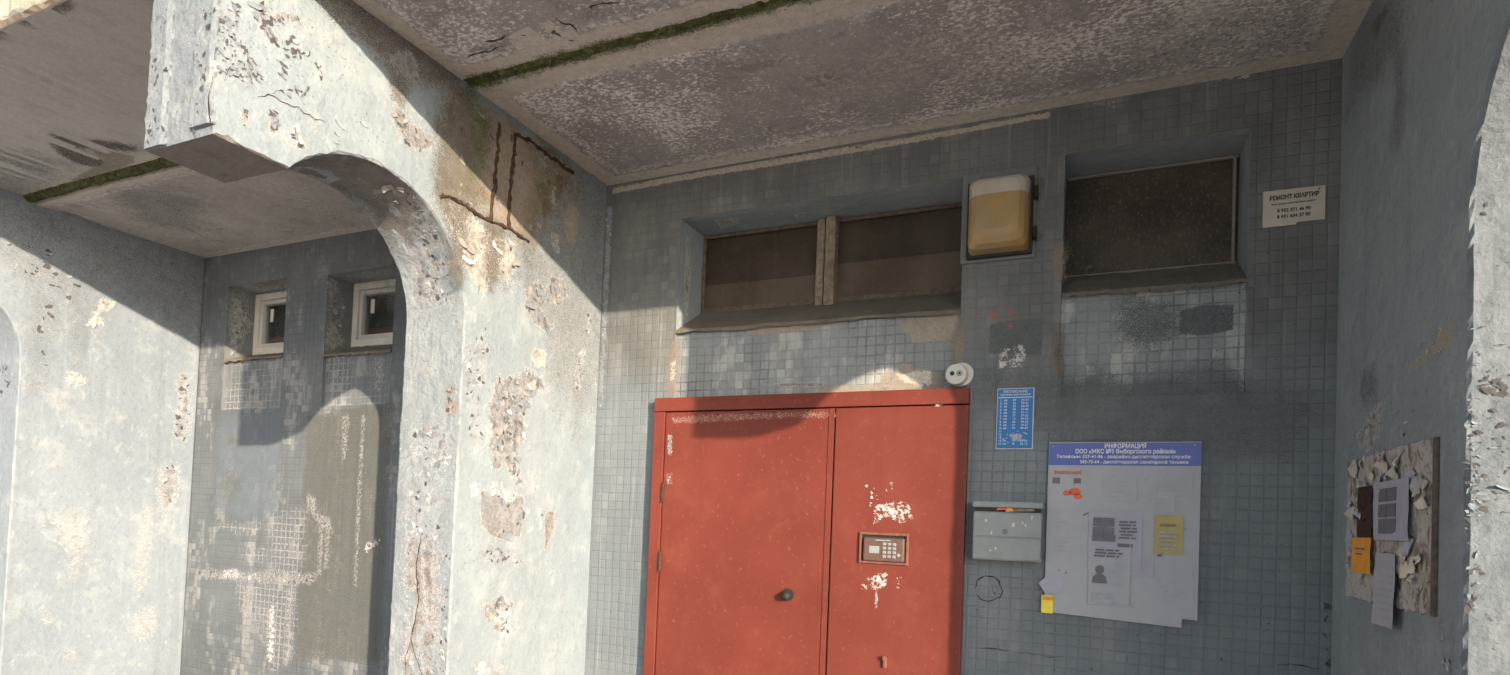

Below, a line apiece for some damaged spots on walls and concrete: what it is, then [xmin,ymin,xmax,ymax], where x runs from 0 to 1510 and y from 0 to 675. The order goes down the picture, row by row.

water stain [0,133,144,195]
peeling [192,0,323,150]
water stain [285,0,893,294]
peeling [482,591,515,637]